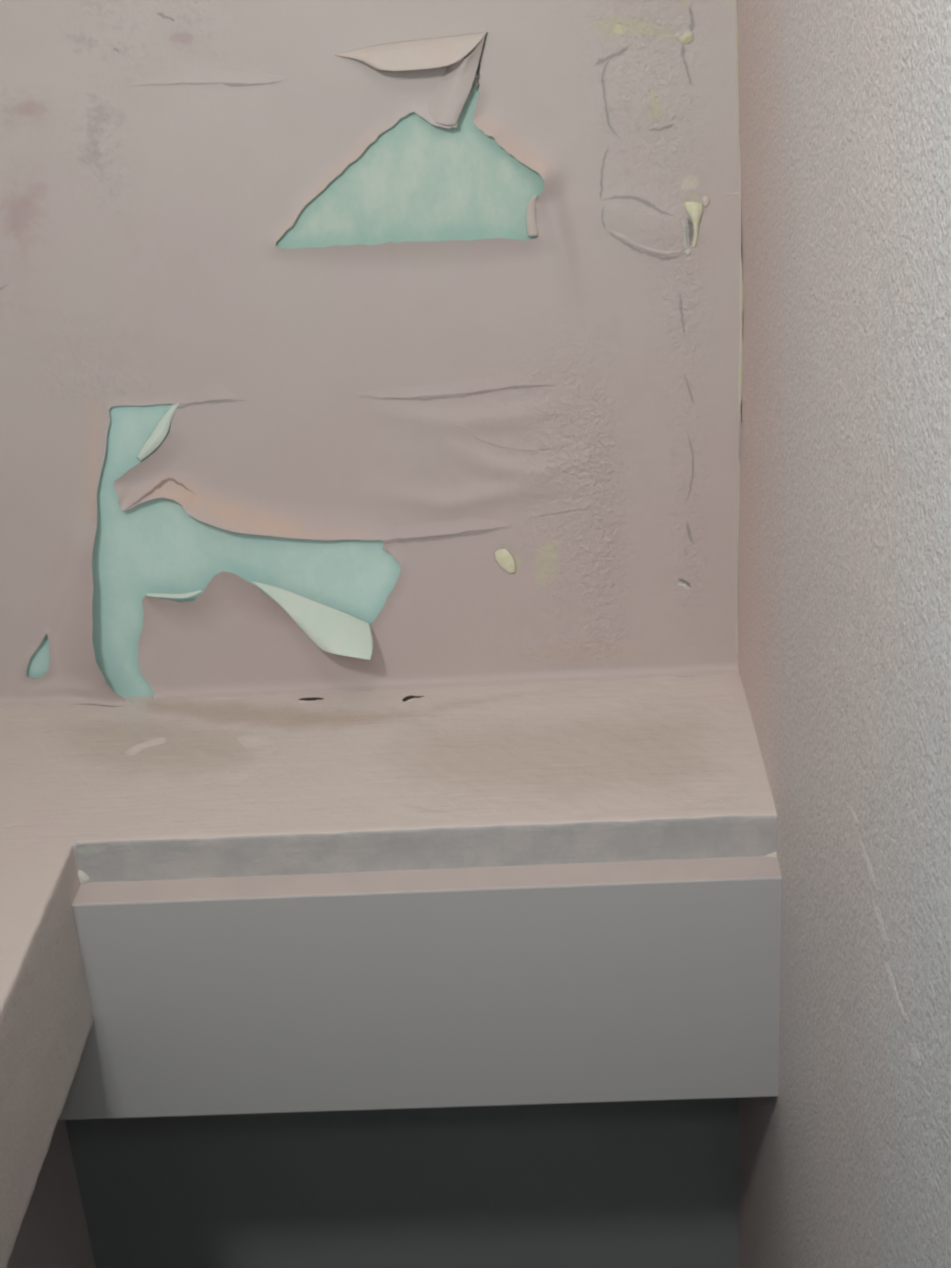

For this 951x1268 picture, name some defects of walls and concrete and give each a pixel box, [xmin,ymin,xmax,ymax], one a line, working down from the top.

peeling [264,32,569,268]
crack [594,44,675,200]
crack [680,6,696,85]
crack [684,375,694,544]
peeling [55,397,413,707]